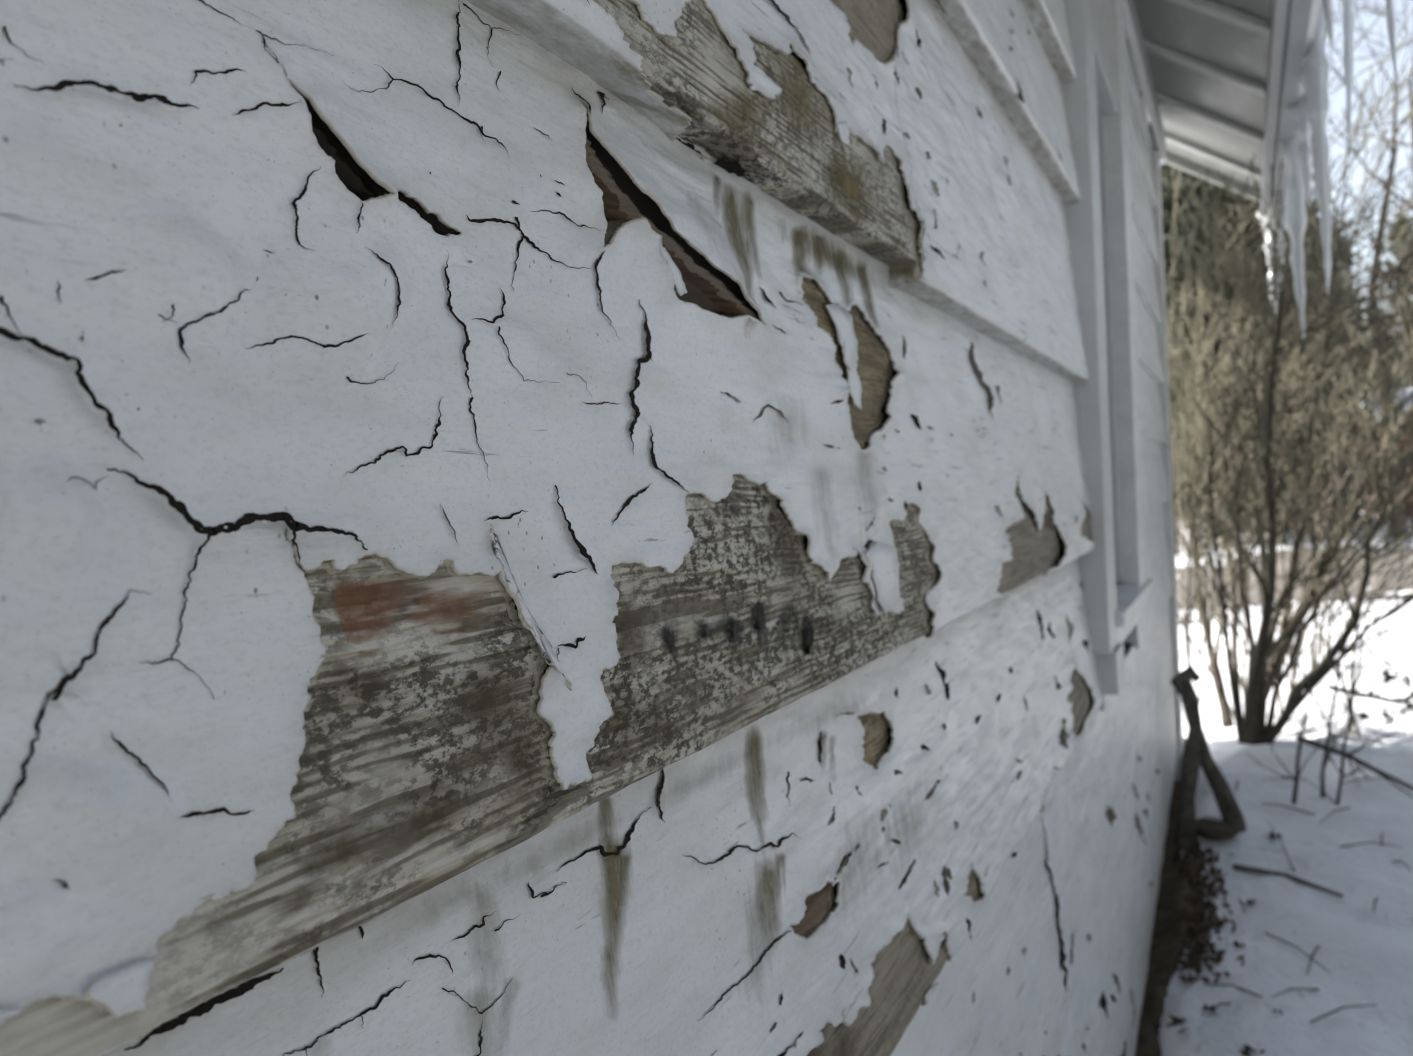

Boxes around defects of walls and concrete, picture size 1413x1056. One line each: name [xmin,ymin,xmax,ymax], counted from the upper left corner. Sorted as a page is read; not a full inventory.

crack [0,0,518,153]
crack [248,186,687,524]
peeling [585,138,787,334]
water stain [745,197,754,243]
peeling [593,0,960,280]
water stain [813,236,876,324]
peeling [801,277,907,450]
crack [0,289,368,819]
peeling [994,482,1063,594]
peeling [0,475,950,1056]
crack [124,768,665,1056]
water stain [759,857,784,928]